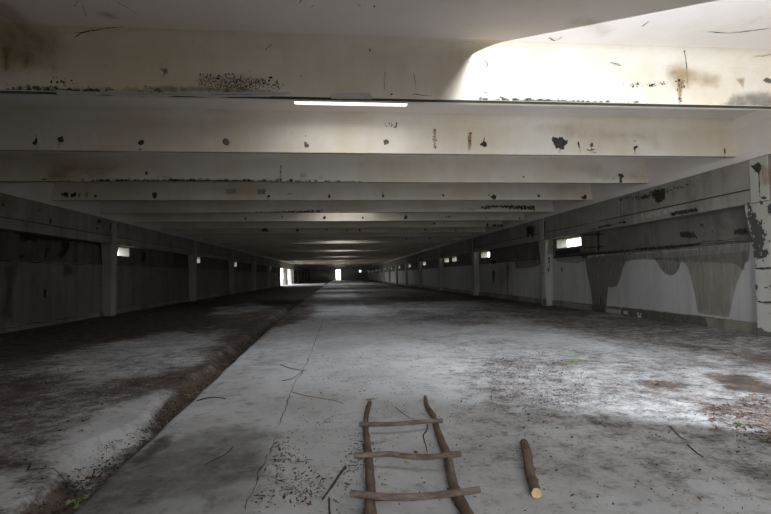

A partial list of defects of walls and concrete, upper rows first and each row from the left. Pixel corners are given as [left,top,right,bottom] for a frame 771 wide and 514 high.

leakage [6,77,109,92]
leakage [196,73,280,91]
rust [673,71,688,102]
spalling [552,137,568,150]
peeling [746,196,771,270]
crack [245,319,324,510]